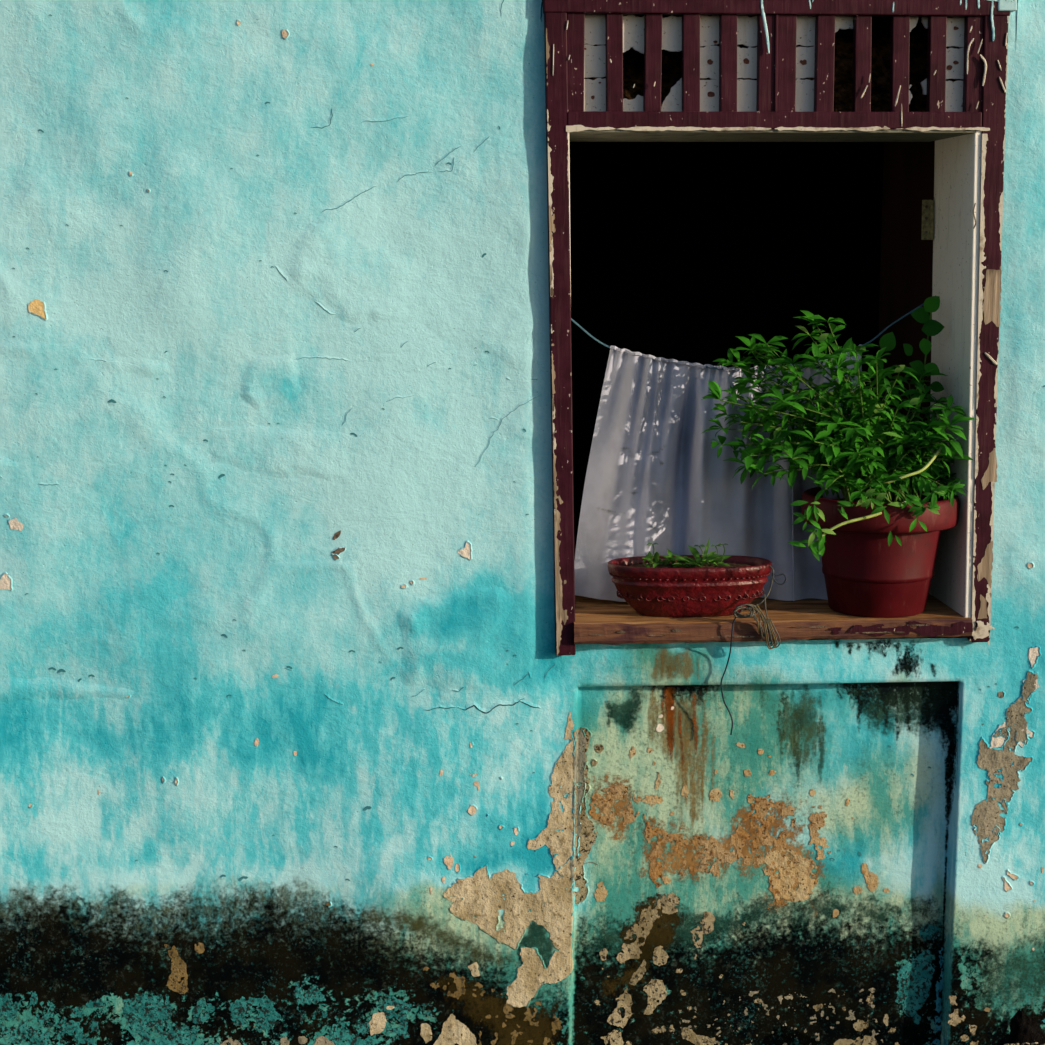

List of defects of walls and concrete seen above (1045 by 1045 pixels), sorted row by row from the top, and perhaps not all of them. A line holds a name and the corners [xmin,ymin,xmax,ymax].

peeling [27,299,48,321]
crack [411,664,555,714]
water stain [0,639,1045,1045]
peeling [280,712,840,1045]
corrosion [589,774,635,840]
corrosion [642,648,825,911]
peeling [970,646,1041,868]
peeling [0,991,106,1045]
peeling [123,944,215,1045]
peeling [227,995,281,1033]
peeling [651,988,899,1045]
peeling [895,924,979,1045]